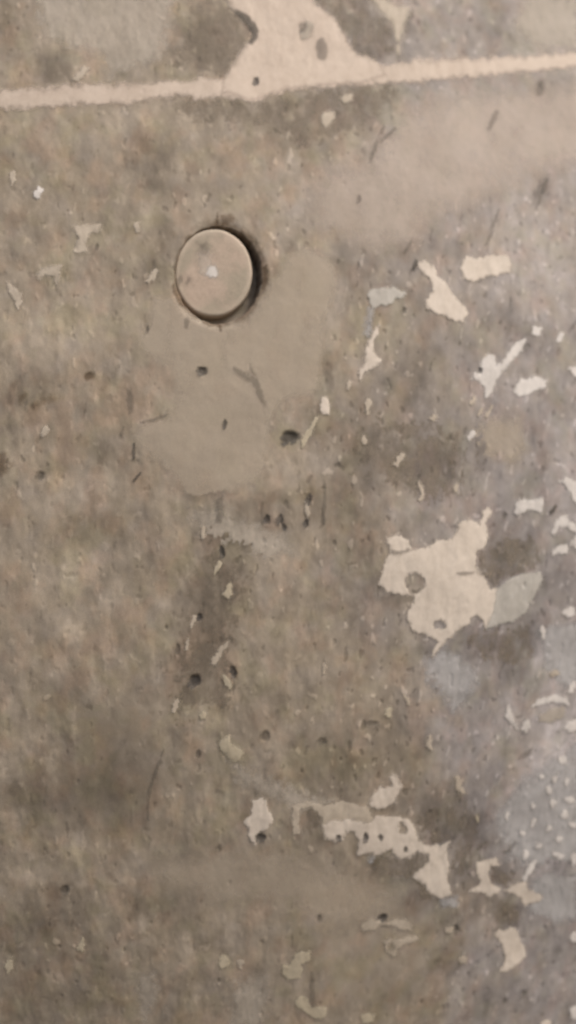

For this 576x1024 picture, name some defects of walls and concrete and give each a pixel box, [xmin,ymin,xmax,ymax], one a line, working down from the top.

peeling [335,0,412,62]
peeling [418,260,468,323]
peeling [460,255,511,282]
peeling [469,326,547,418]
peeling [378,507,543,656]
peeling [244,798,273,845]
peeling [292,773,451,899]
peeling [494,927,526,973]